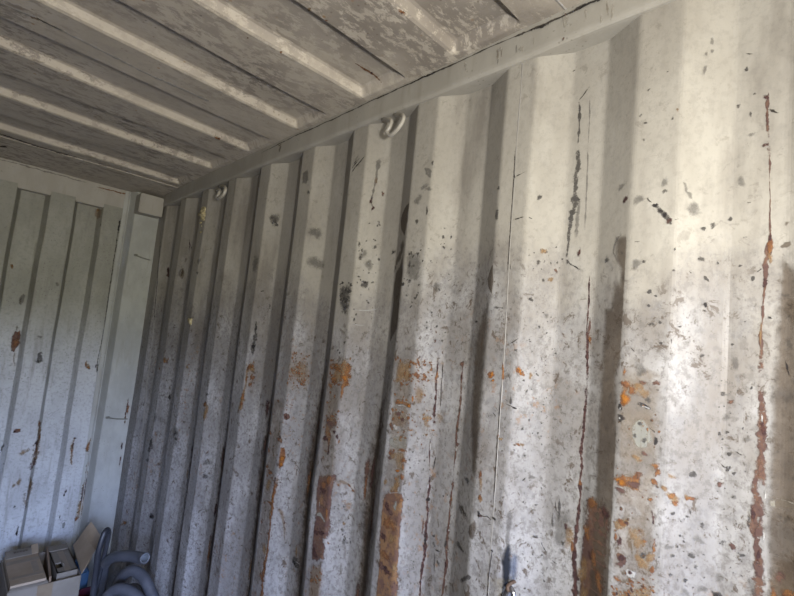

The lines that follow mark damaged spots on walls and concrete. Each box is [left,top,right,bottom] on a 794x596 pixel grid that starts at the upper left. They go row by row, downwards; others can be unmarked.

rust [11,331,21,352]
rust [620,368,660,407]
rust [295,356,435,596]
rust [614,451,695,506]
rust [578,497,656,596]